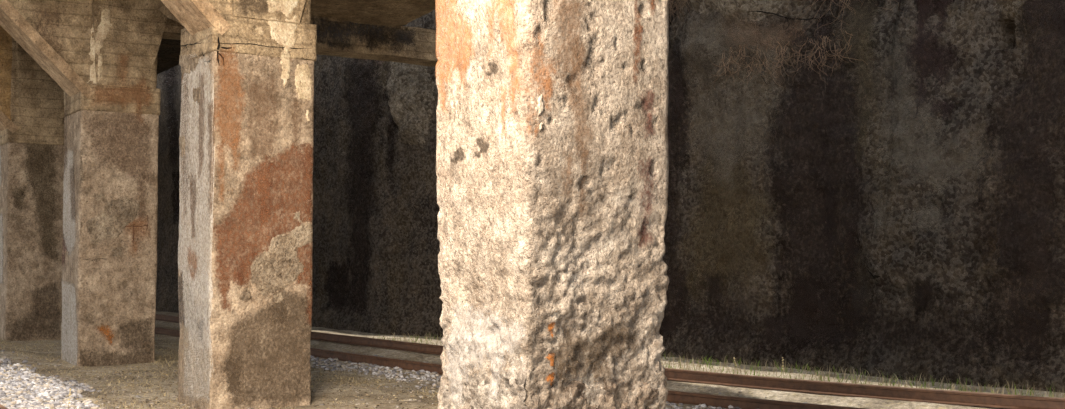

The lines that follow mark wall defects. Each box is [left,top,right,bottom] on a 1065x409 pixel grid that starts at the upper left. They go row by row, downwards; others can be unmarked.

peeling [255,0,313,121]
corrosion [435,0,471,107]
corrosion [489,0,518,132]
leakage [163,61,215,237]
leakage [178,268,311,405]
corrosion [215,143,313,309]
corrosion [297,243,312,323]
leakage [313,17,416,319]
leakage [659,0,1065,377]